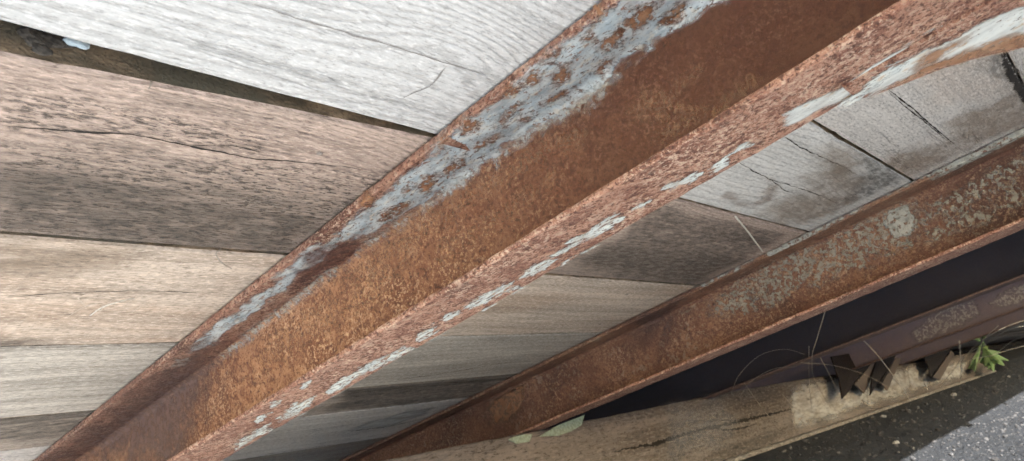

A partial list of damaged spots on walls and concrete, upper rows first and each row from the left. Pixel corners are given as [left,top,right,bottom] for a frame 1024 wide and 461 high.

crack [889,90,963,151]
crack [3,125,361,170]
peeling [172,0,720,367]
peeling [661,142,754,190]
crack [739,162,839,205]
crack [785,137,855,174]
corrosion [297,242,359,289]
peeling [235,200,652,451]
corrosion [830,354,901,399]
corrosion [923,349,954,380]